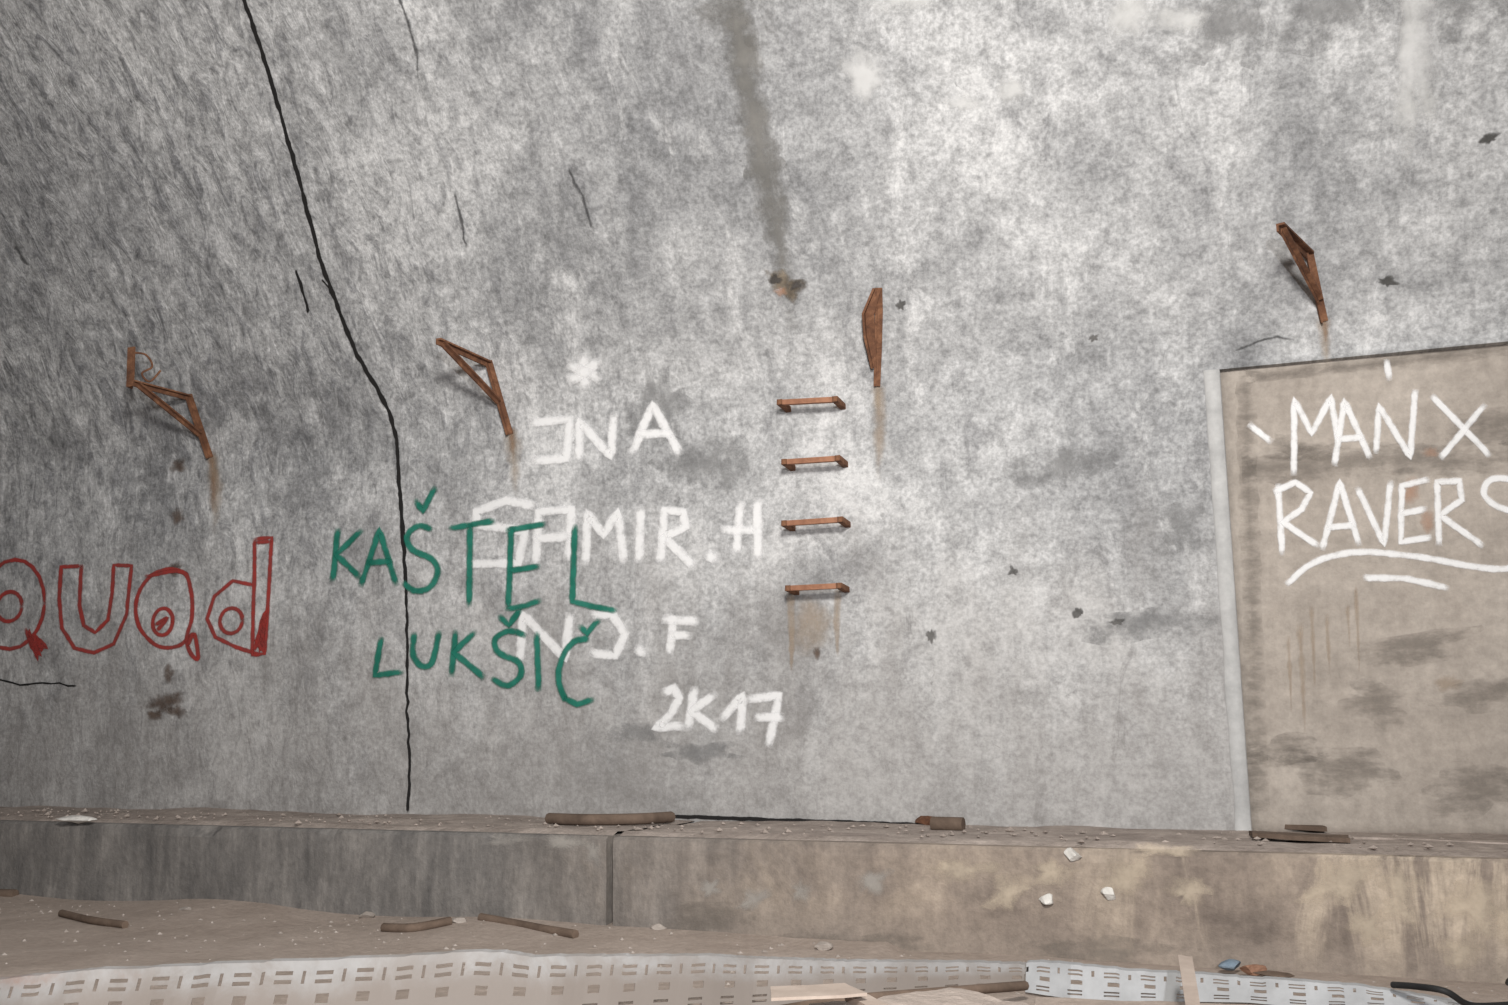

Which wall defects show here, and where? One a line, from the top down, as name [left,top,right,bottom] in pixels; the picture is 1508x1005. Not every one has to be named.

crack [399,0,418,69]
leakage [719,0,785,265]
crack [242,0,411,811]
rust [148,666,182,719]